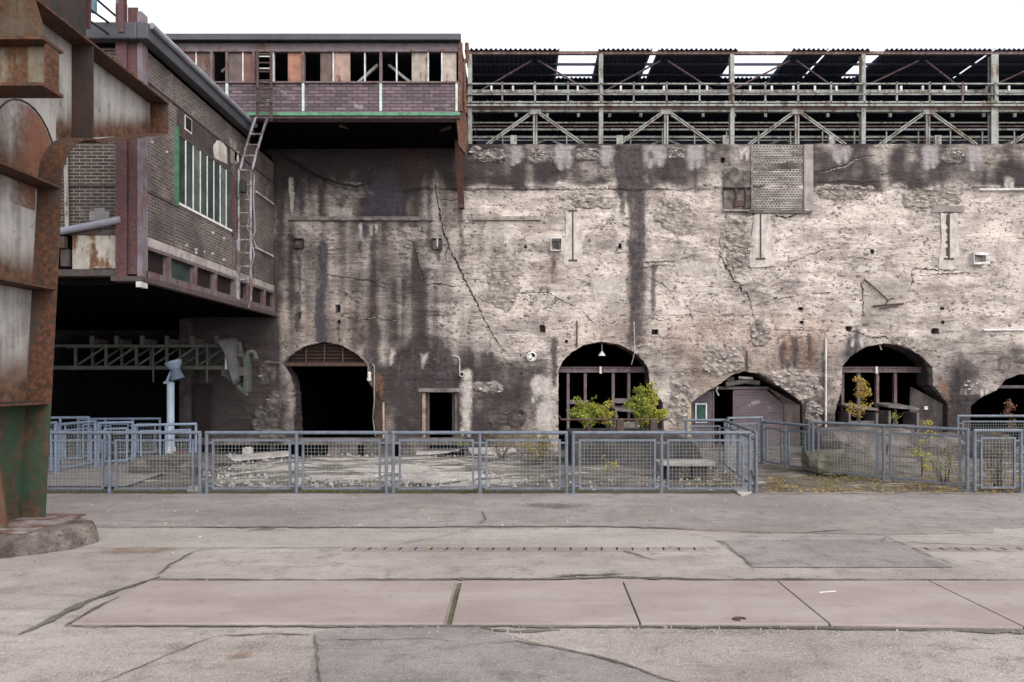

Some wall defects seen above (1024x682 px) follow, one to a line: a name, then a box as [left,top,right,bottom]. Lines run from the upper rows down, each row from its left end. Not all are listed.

rust [15,107,51,211]
leakage [274,159,306,328]
leakage [315,241,328,341]
crack [402,165,715,352]
leakage [614,145,657,346]
crack [715,250,892,340]